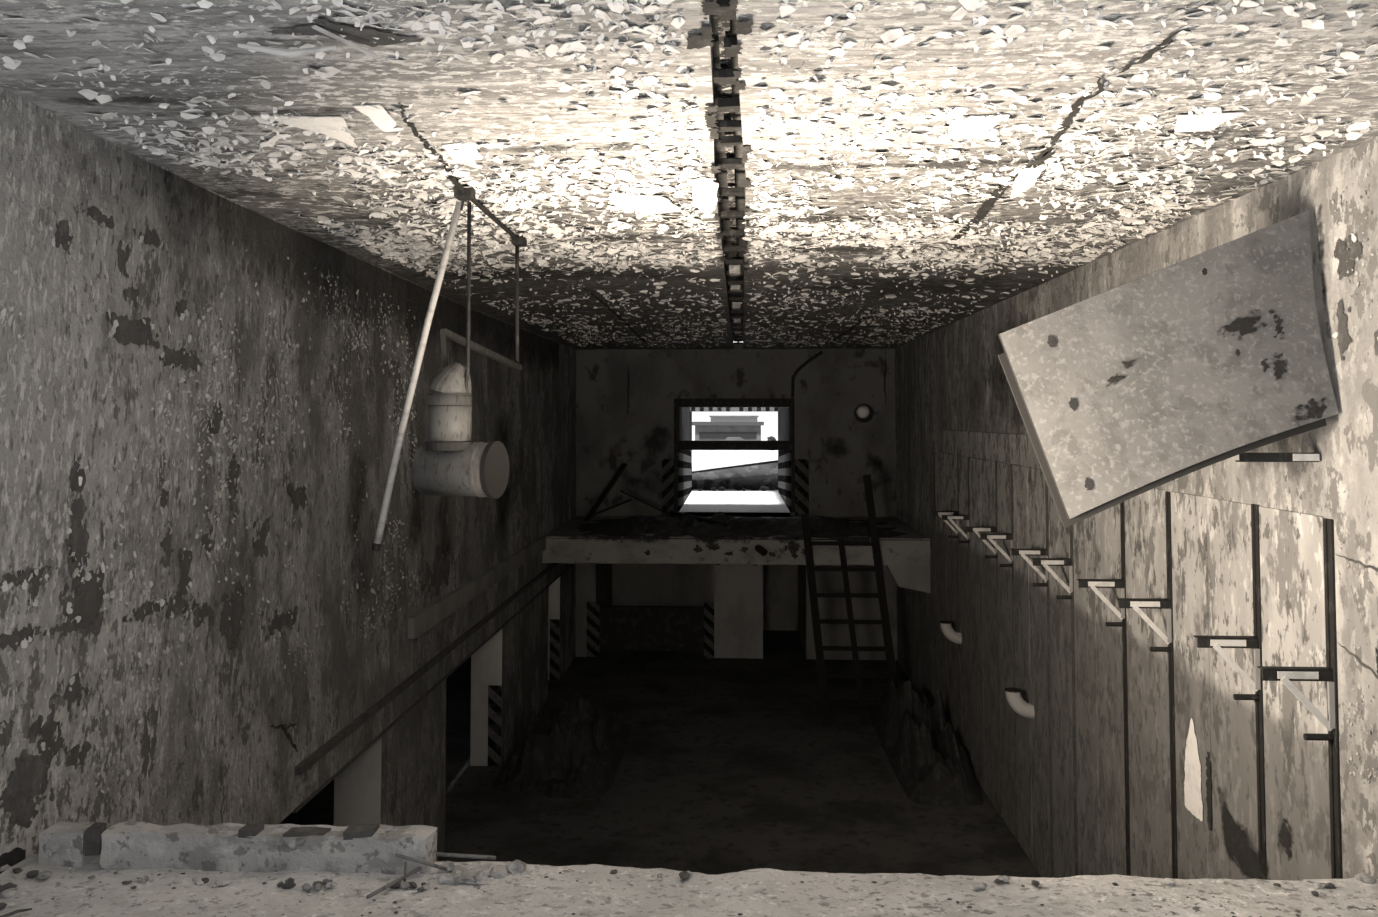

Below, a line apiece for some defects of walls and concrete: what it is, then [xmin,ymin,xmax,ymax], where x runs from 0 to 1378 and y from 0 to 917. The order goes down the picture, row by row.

peeling [0,0,1378,372]
crack [950,28,1185,240]
peeling [0,454,107,652]
peeling [123,479,245,651]
peeling [207,400,242,511]
peeling [252,517,270,558]
peeling [265,606,300,642]
peeling [287,482,308,510]
peeling [0,673,91,830]
spalling [0,847,26,874]